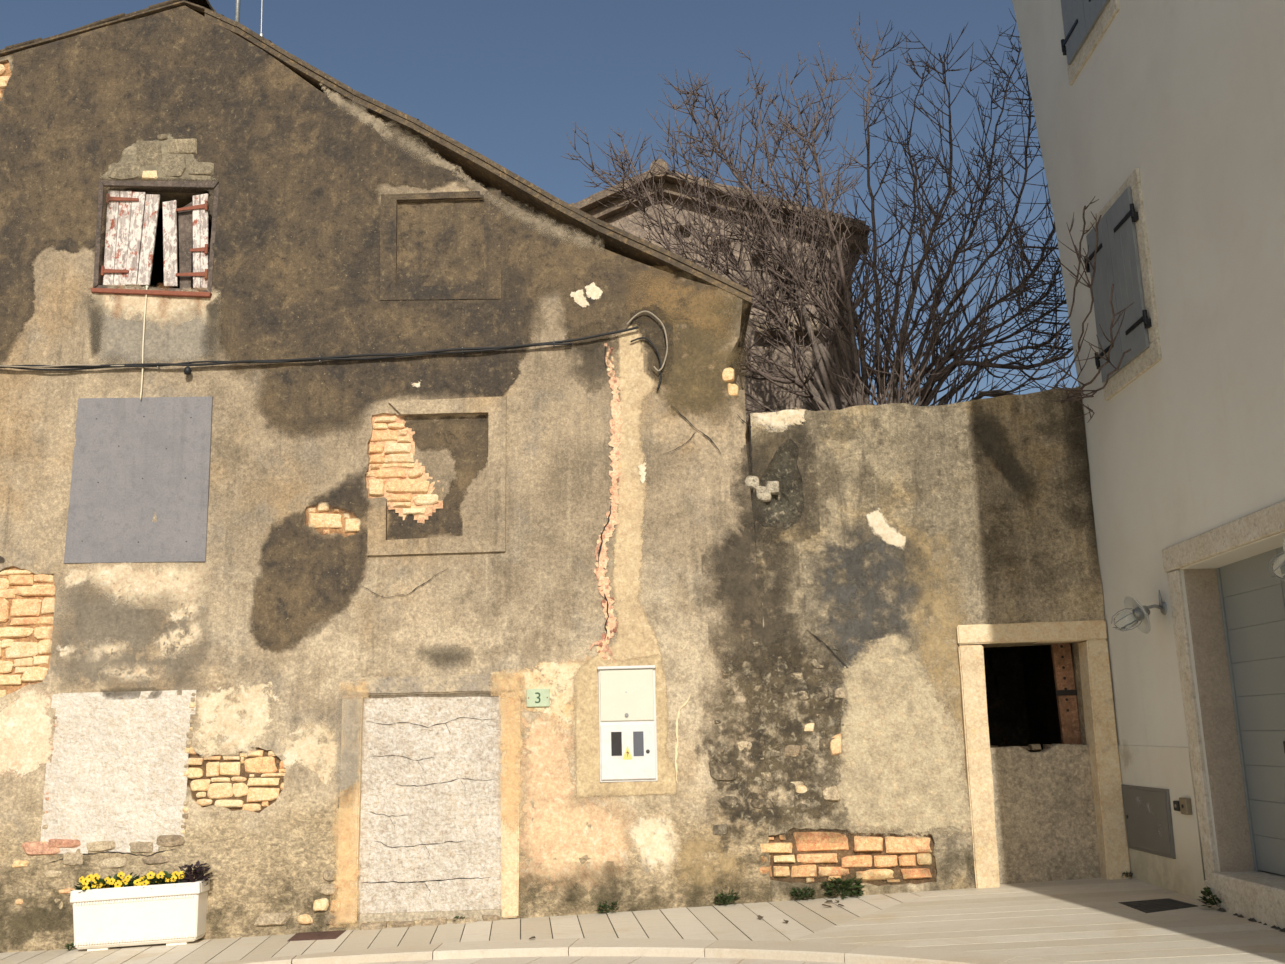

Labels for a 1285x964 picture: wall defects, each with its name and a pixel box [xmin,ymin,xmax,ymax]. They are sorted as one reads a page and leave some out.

leakage [90,287,219,363]
flaking render [0,6,718,652]
leakage [574,334,612,382]
leakage [630,296,741,415]
spalling [866,508,906,550]
spalling [0,556,57,778]
spalling [12,680,339,894]
leakage [680,519,963,907]
flaking render [760,634,972,886]
leakage [565,873,667,913]
leakage [965,851,975,876]